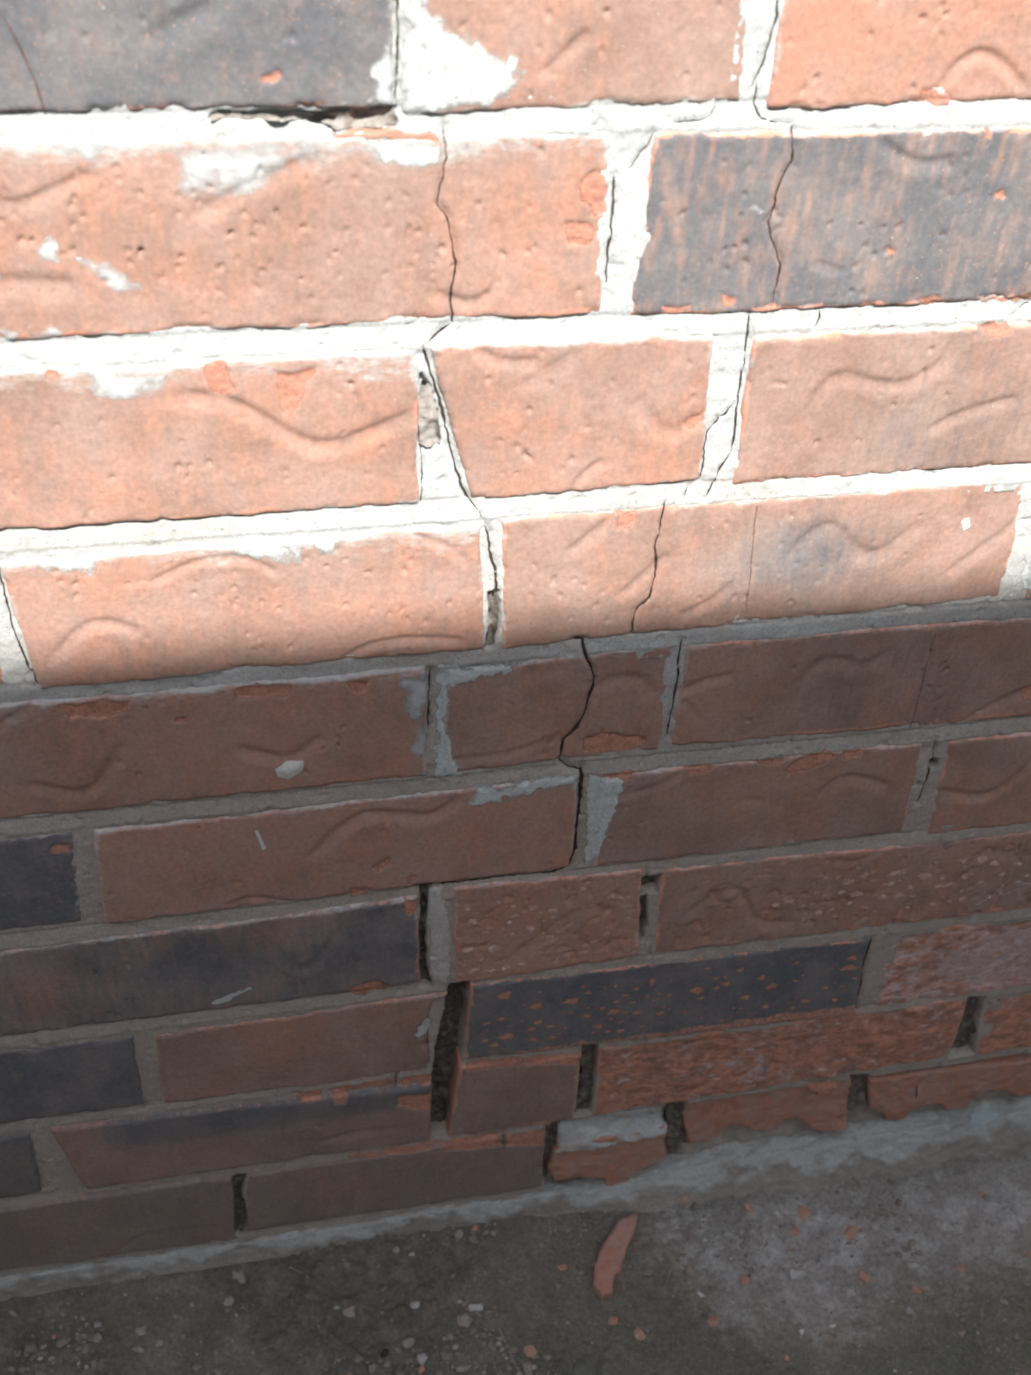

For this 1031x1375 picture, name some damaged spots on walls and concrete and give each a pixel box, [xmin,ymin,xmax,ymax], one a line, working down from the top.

crack [0,13,46,114]
crack [419,126,498,593]
crack [605,105,716,283]
crack [631,0,794,632]
crack [398,637,595,891]
peeling [580,876,654,922]
spalling [772,849,1030,922]
spalling [294,885,1031,1186]